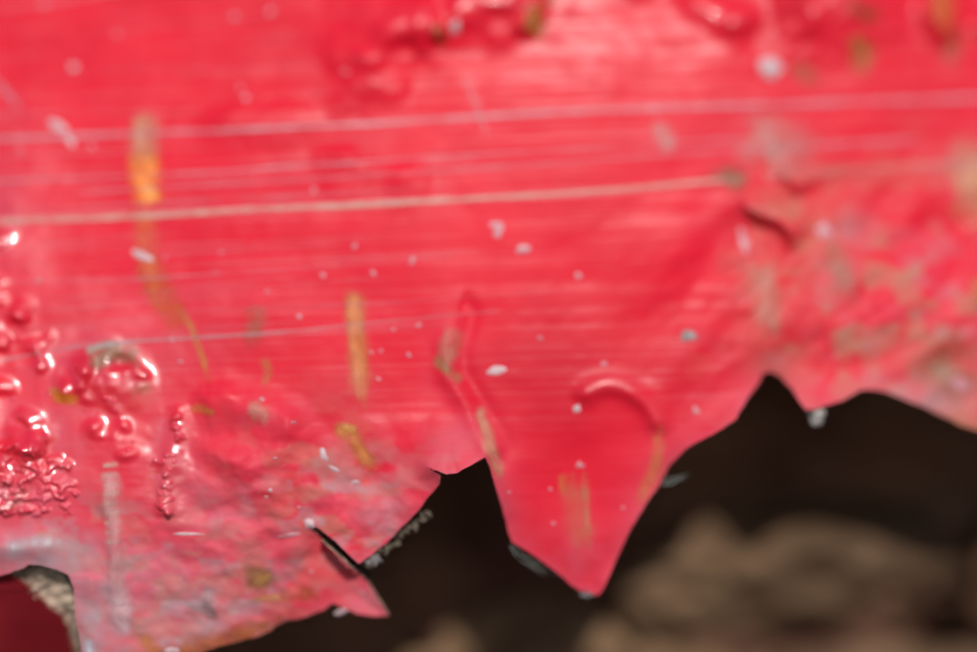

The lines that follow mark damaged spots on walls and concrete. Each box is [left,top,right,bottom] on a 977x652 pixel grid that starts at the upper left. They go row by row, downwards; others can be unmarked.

corrosion [133,118,194,336]
corrosion [346,294,366,395]
peeling [320,447,340,472]
peeling [277,519,315,538]
spalling [361,510,433,568]
spalling [11,564,82,652]